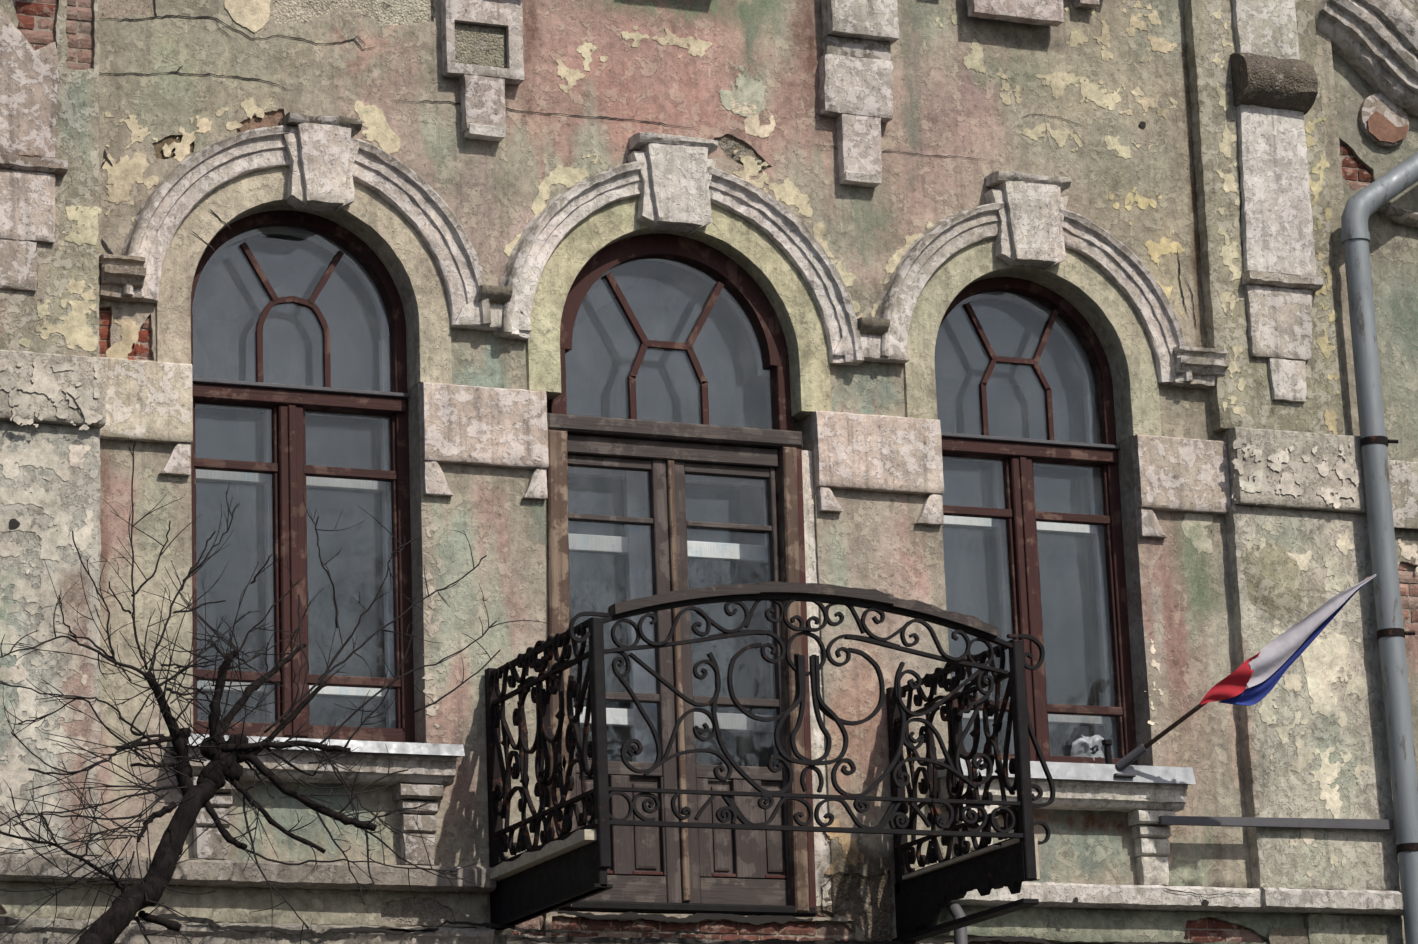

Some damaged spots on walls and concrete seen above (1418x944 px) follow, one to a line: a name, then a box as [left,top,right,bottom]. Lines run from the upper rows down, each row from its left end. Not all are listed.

flaking render [12,0,156,70]
crack [99,65,291,91]
crack [99,15,377,50]
peeling [555,42,608,93]
peeling [59,97,284,251]
peeling [714,65,878,319]
flaking render [1305,117,1372,230]
peeling [883,221,933,284]
crack [1177,249,1196,326]
peeling [1231,253,1361,509]
peeling [0,278,152,854]
flaking render [1397,538,1418,642]